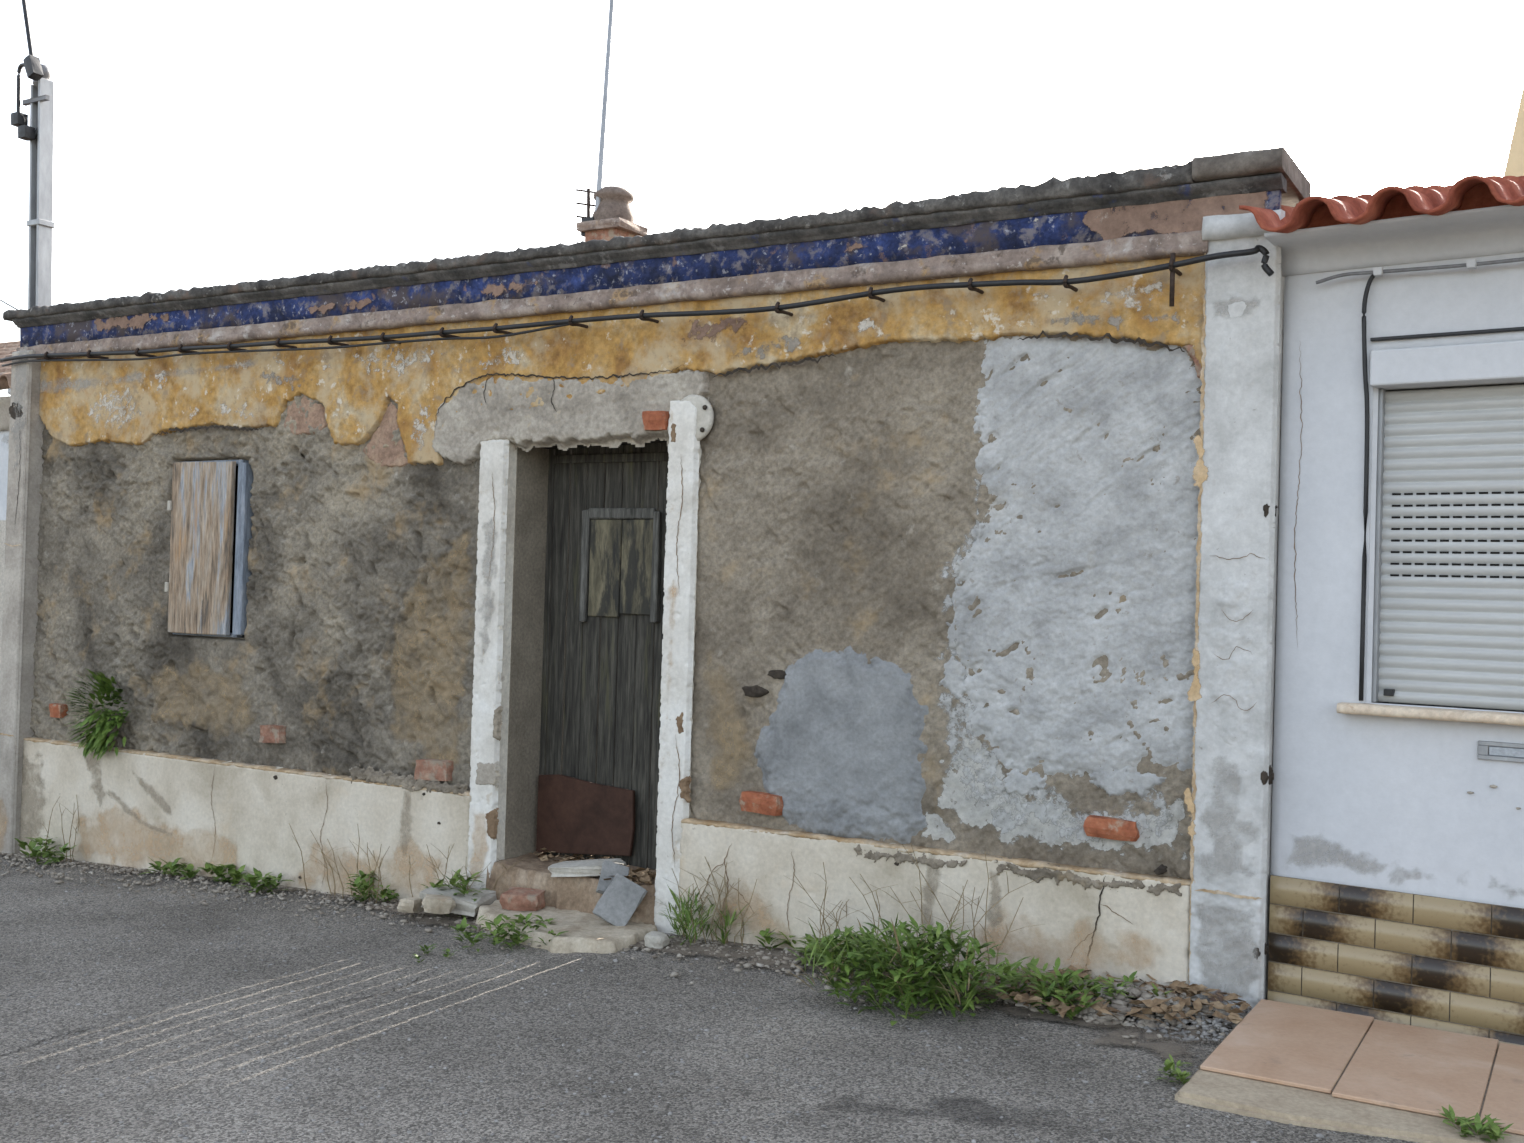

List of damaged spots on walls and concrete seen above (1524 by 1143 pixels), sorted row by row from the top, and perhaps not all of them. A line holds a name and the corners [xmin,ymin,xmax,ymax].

peeling [481,281,538,297]
peeling [308,298,371,314]
peeling [94,313,169,332]
peeling [1040,282,1179,386]
peeling [353,344,434,376]
peeling [480,348,519,370]
flaking render [642,411,676,442]
flaking render [30,357,500,796]
flaking render [676,317,1202,896]
crack [1018,253,1303,984]
peeling [493,706,503,741]
peeling [485,808,499,840]